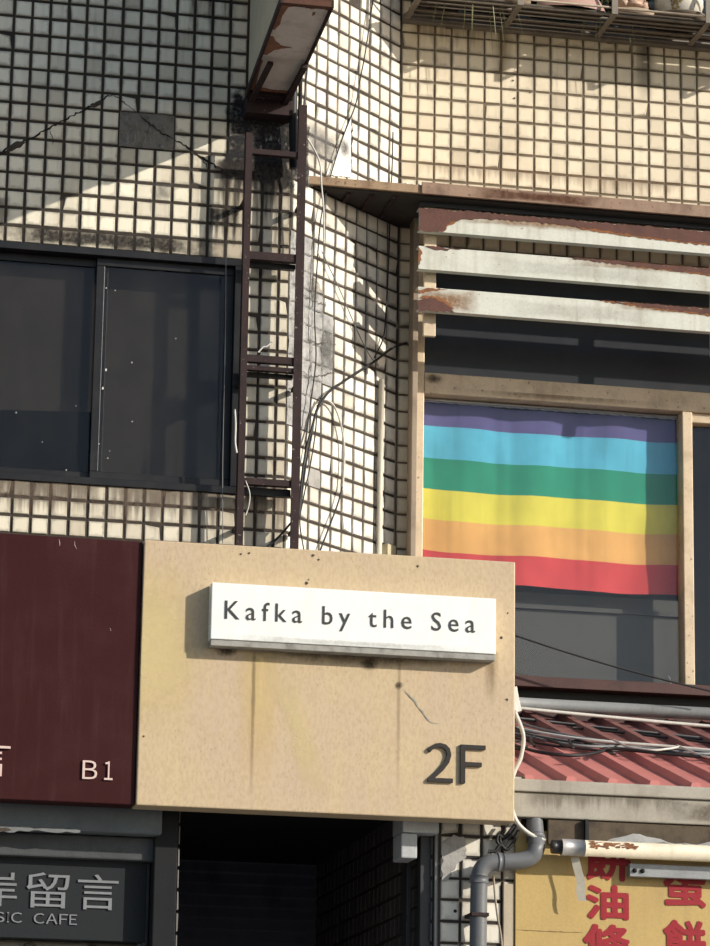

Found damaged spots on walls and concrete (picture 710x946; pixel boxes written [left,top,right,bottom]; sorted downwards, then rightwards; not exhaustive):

crack [0,94,136,155]
peeling [119,112,174,150]
crack [175,140,235,177]
damp [210,160,286,237]
rust [487,190,585,205]
rust [418,207,710,246]
rust [573,257,710,276]
rust [417,288,466,312]
rust [603,300,710,316]
peeling [287,230,336,432]
damp [0,481,92,507]
damp [115,489,221,516]